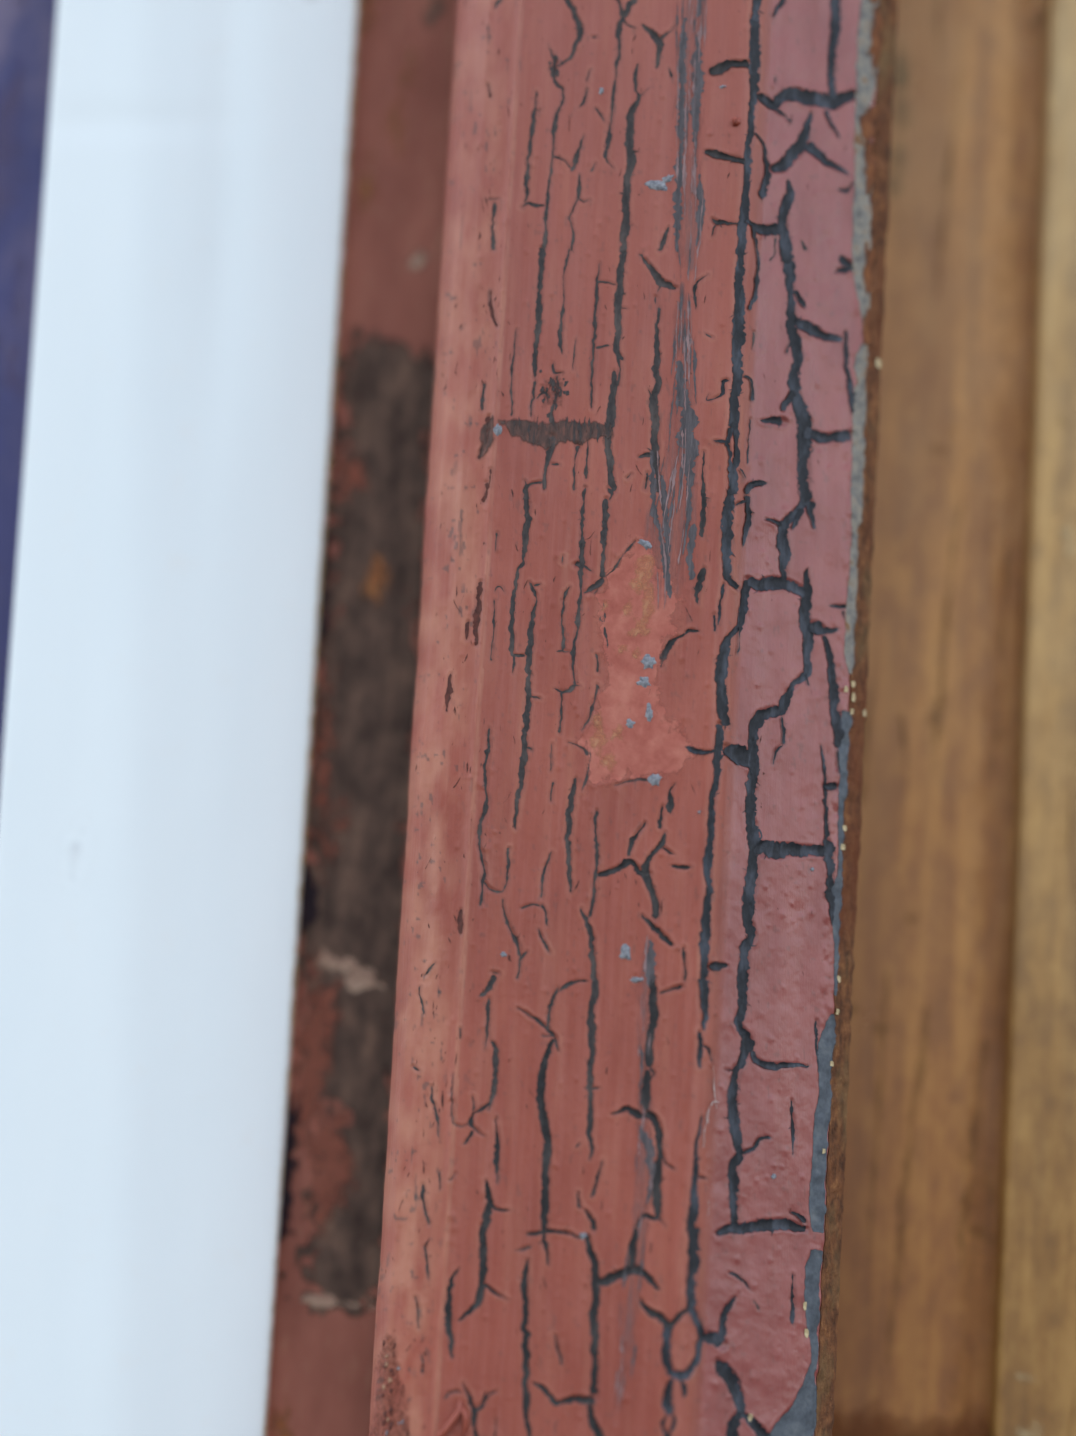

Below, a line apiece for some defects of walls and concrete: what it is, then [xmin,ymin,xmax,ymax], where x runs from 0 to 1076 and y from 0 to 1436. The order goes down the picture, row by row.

crack [413,0,857,1436]
peeling [577,537,696,790]
peeling [831,711,853,996]
peeling [767,1014,836,1436]